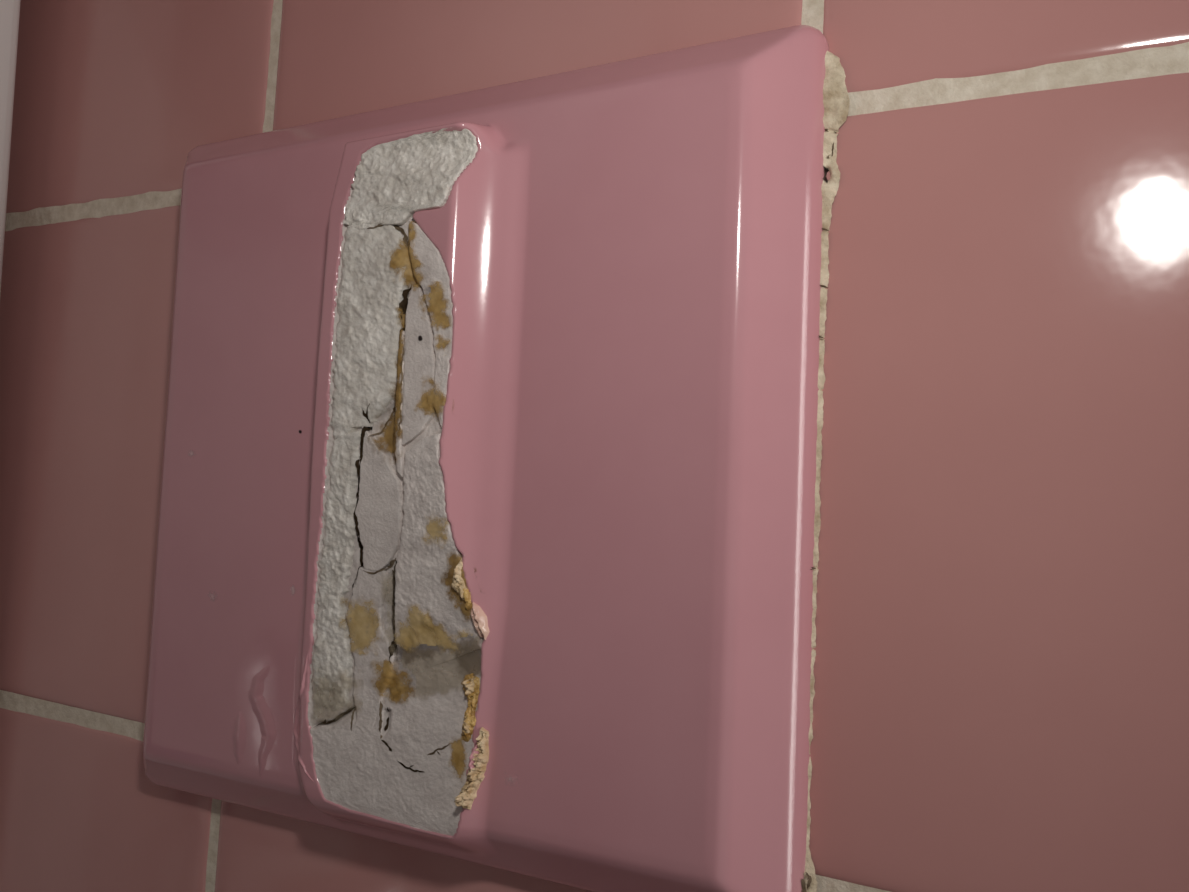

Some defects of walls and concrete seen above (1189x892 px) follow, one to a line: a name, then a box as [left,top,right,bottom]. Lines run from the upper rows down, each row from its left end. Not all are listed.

crack [367,223,408,247]
crack [352,285,412,664]
spalling [308,128,484,836]
crack [315,701,450,772]